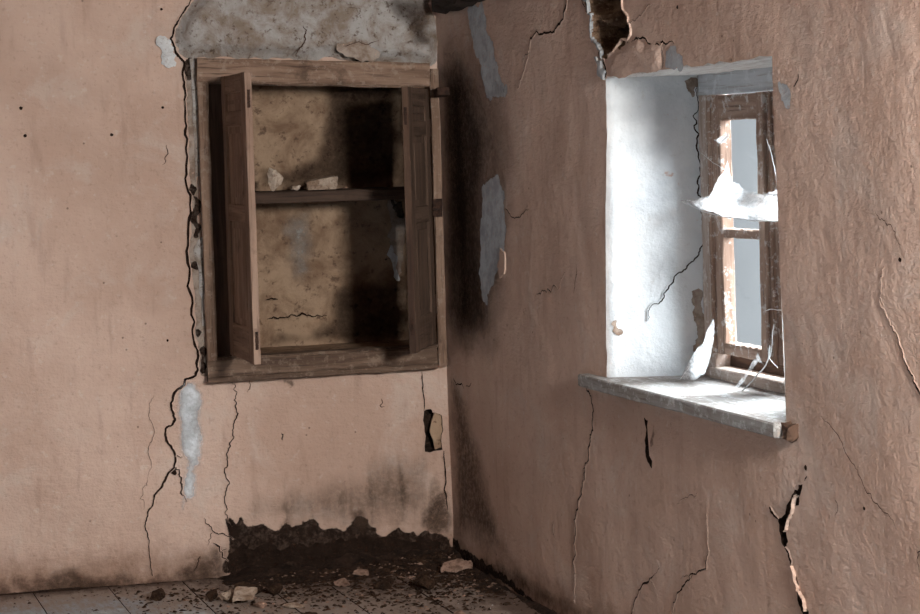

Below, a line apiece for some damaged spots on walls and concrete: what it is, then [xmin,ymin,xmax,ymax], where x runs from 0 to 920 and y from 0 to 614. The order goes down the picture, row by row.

peeling [467,2,507,101]
crack [517,0,587,90]
spalling [583,0,632,80]
crack [139,0,200,576]
peeling [156,35,207,377]
peeling [479,174,506,305]
crack [879,268,920,396]
peeling [180,384,201,497]
crack [196,381,251,567]
spalling [423,409,443,452]
crack [631,493,710,614]
crack [769,476,809,614]